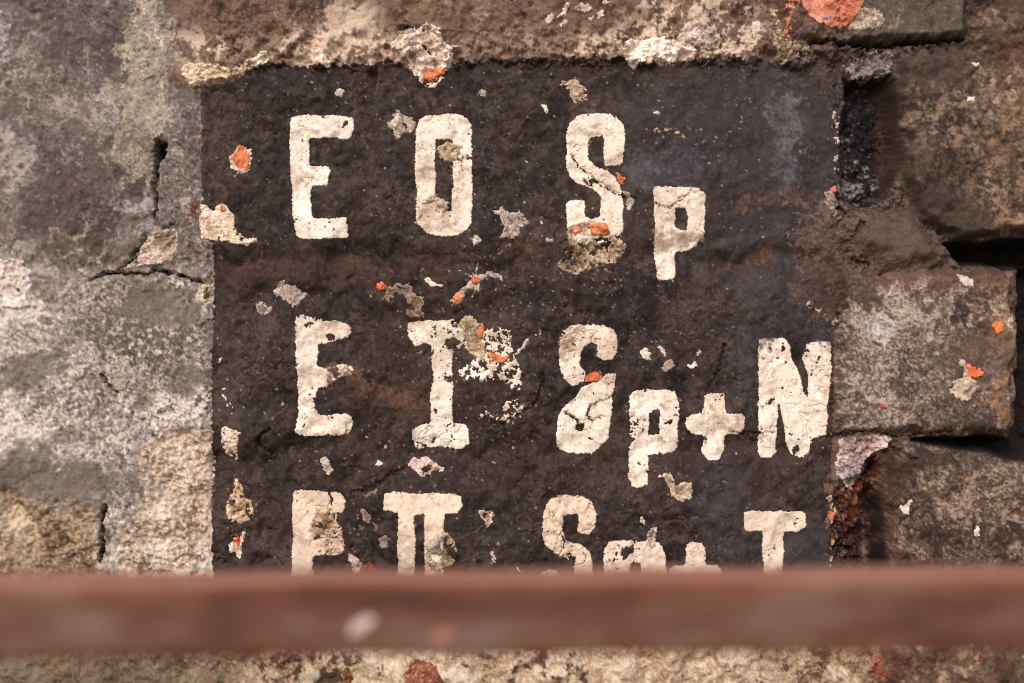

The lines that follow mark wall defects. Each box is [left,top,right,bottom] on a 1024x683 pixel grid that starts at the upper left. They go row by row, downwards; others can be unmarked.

flaking render [782,0,865,38]
spalling [387,22,461,88]
crack [92,173,206,283]
spalling [199,203,257,246]
spalling [493,206,543,255]
spalling [557,221,627,275]
peeling [458,315,541,424]
peeling [838,454,883,484]
crack [99,506,109,563]
spalling [226,478,254,559]
corrosion [838,478,868,564]